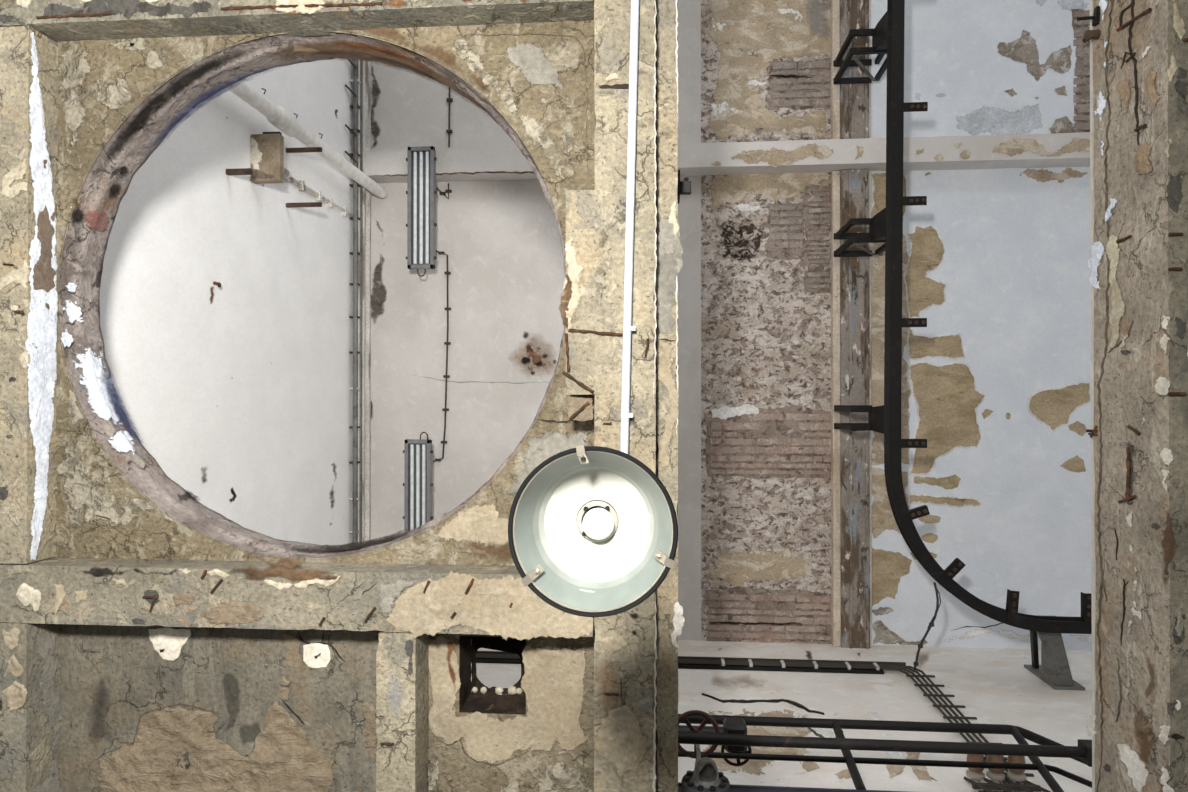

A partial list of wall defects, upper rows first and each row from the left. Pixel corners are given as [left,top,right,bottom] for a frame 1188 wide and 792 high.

peeling [0,0,382,560]
rust [521,333,556,374]
spalling [644,0,684,444]
flaking render [705,404,831,479]
flaking render [708,0,834,293]
flaking render [871,243,885,407]
flaking render [872,431,916,607]
flaking render [901,173,1011,558]
flaking render [954,0,1131,159]
flaking render [1027,381,1091,436]
crack [1096,0,1140,792]
flaking render [1103,744,1174,792]